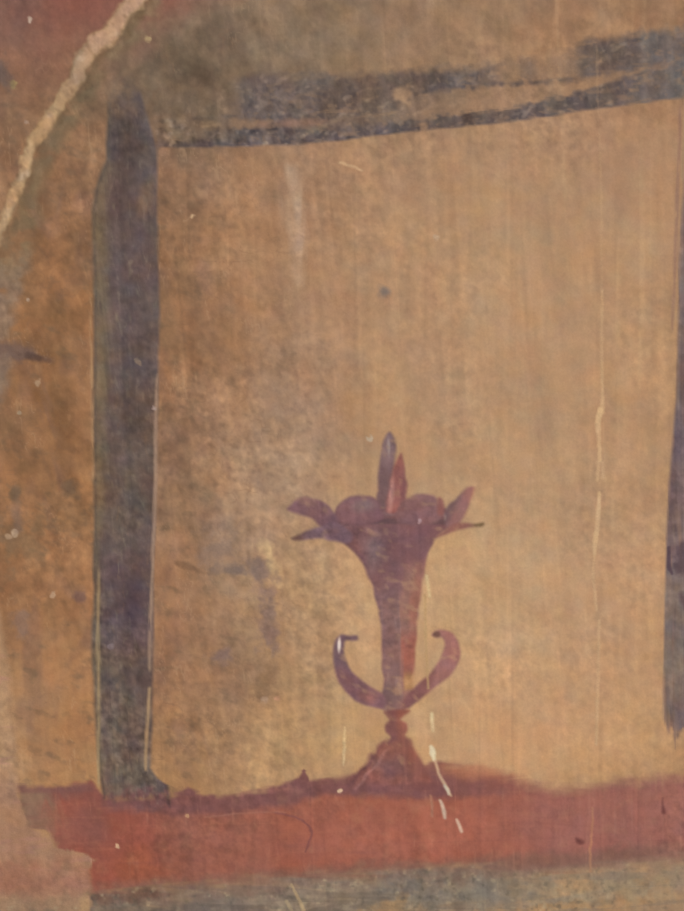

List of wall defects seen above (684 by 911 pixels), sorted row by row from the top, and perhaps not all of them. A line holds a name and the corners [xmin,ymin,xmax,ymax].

crack [0,0,169,412]
peeling [427,711,465,835]